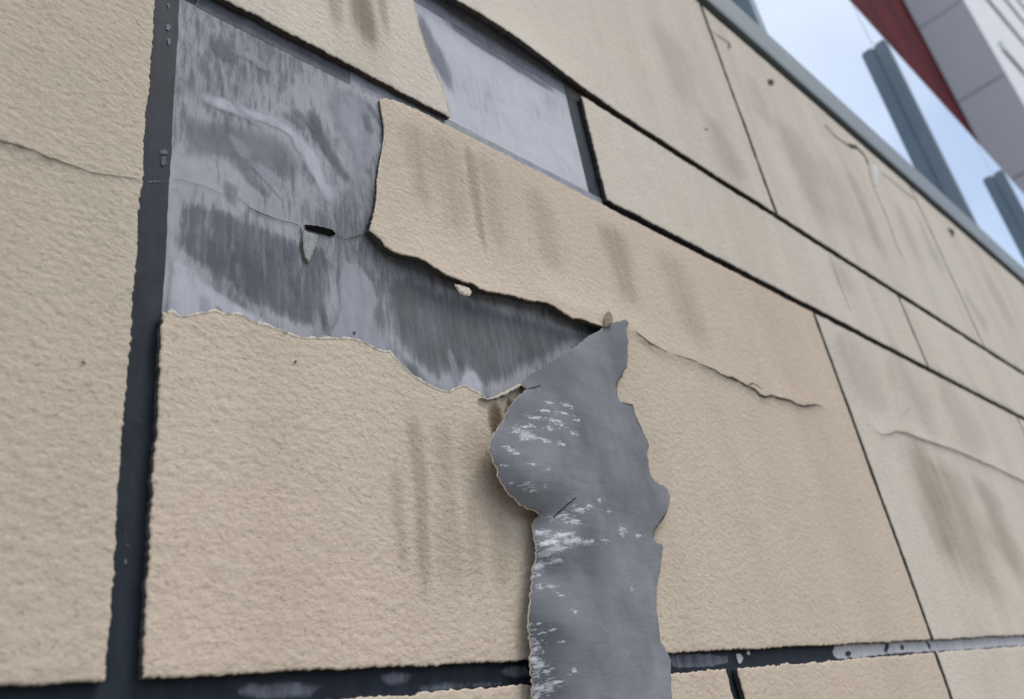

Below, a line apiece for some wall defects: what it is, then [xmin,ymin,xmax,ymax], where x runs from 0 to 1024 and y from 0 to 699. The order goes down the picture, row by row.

crack [0,140,134,179]
peeling [149,0,750,699]
crack [635,331,821,407]